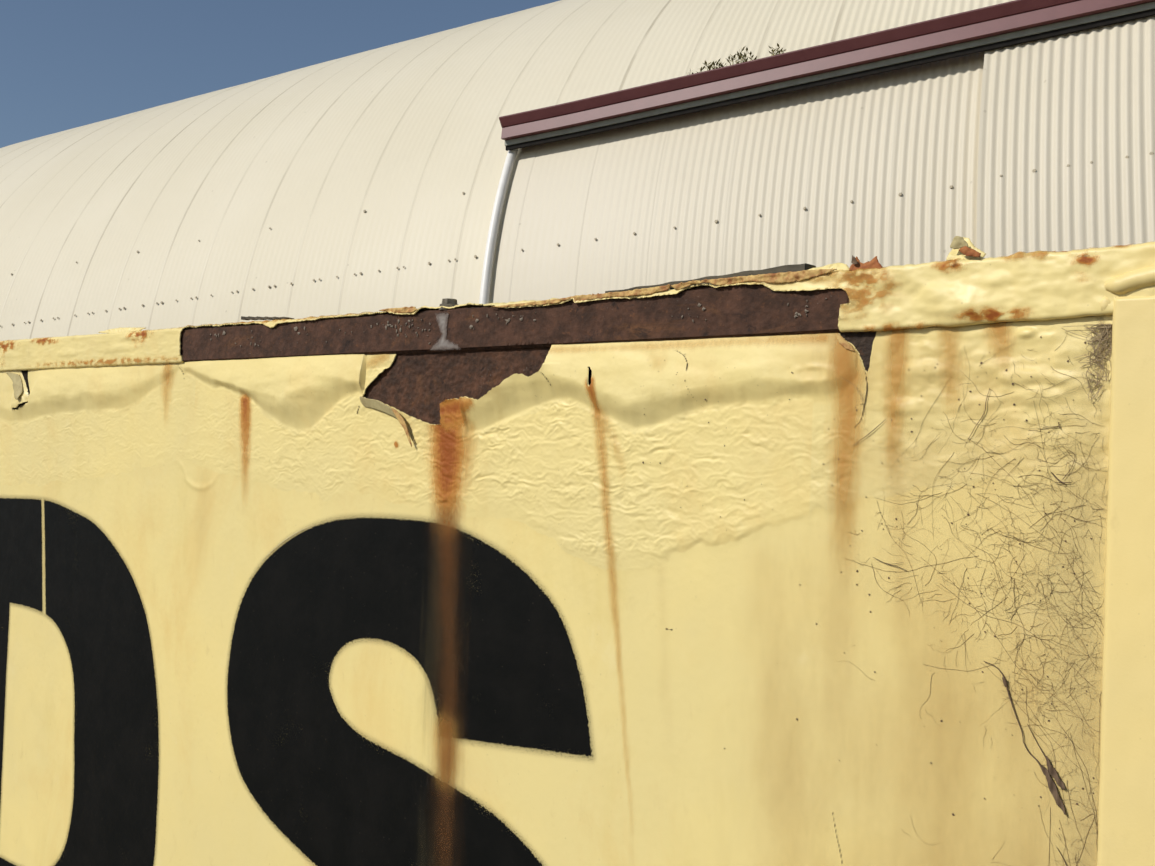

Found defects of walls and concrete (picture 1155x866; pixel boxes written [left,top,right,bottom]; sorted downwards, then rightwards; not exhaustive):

rust [831,268,894,310]
rust [936,259,960,270]
rust [1005,251,1047,259]
rust [1076,254,1096,265]
peeling [181,255,882,447]
rust [241,394,250,453]
rust [431,397,472,527]
rust [586,378,606,495]
rust [816,332,859,502]
rust [438,719,454,782]